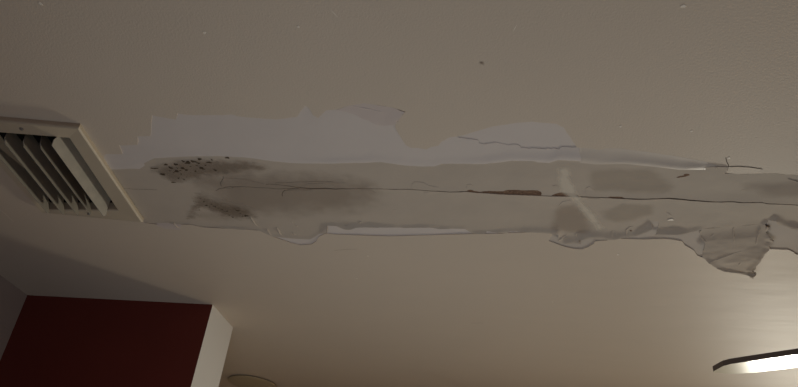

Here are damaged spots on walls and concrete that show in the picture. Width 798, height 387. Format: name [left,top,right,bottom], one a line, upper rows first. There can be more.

peeling [104,106,581,170]
damp [111,156,798,244]
crack [465,184,623,203]
peeling [277,226,471,245]
peeling [627,219,706,260]
peeling [765,220,798,254]